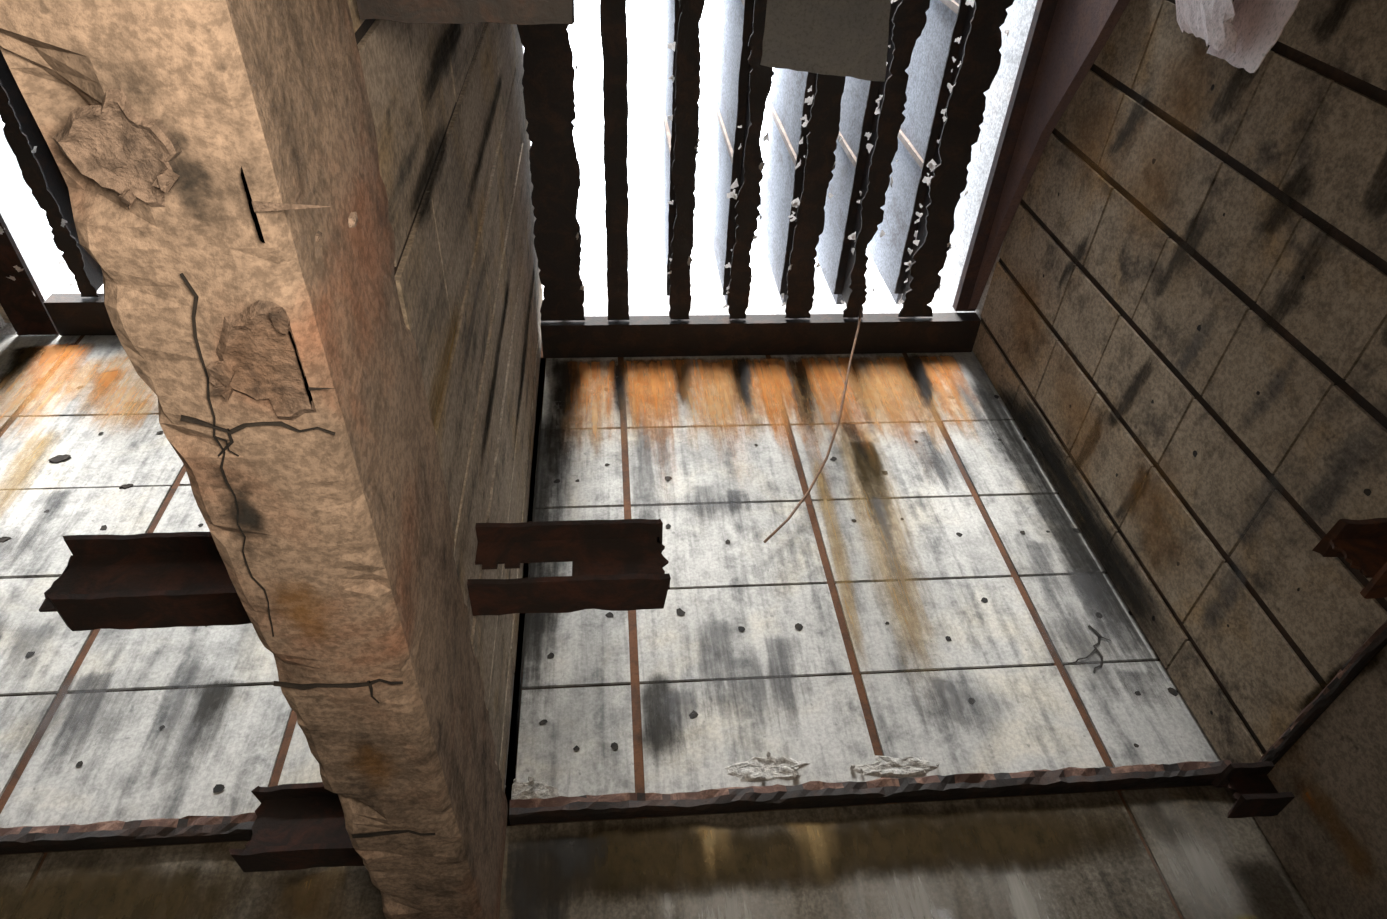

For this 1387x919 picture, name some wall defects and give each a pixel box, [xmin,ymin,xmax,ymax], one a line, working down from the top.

damp [1212,68,1259,122]
damp [1365,152,1387,215]
damp [1059,236,1089,287]
damp [1153,212,1208,295]
rust [0,343,154,420]
rust [0,436,49,508]
crack [179,273,336,637]
rust [564,356,971,644]
damp [923,432,944,479]
damp [39,675,109,733]
damp [167,665,234,759]
damp [642,675,680,756]